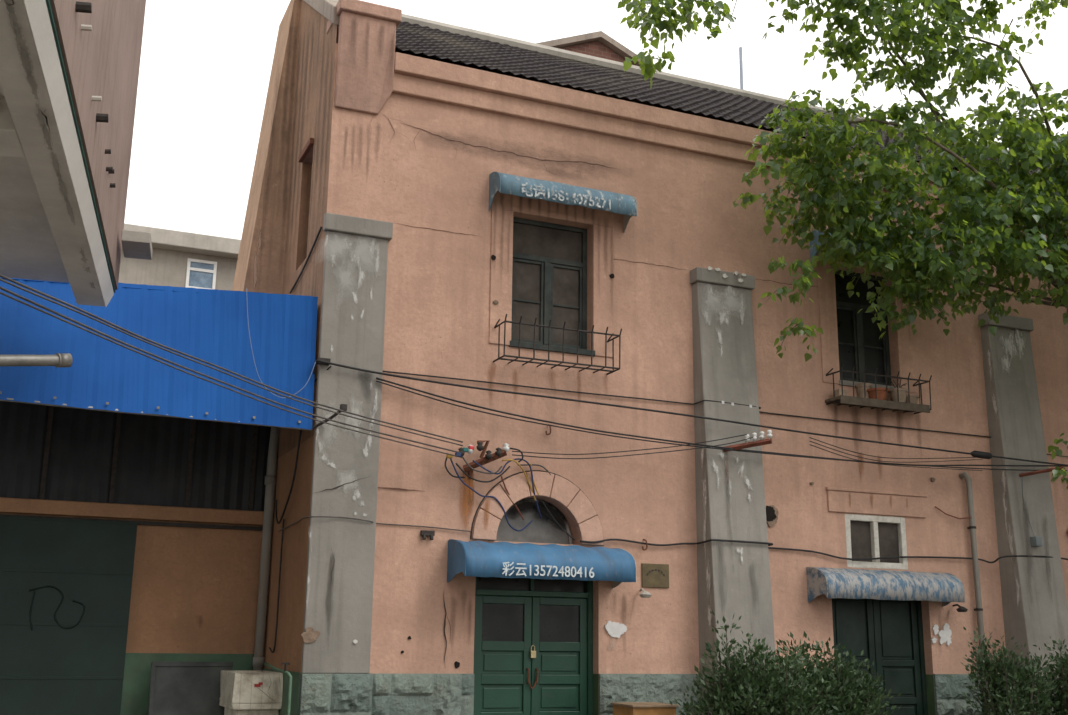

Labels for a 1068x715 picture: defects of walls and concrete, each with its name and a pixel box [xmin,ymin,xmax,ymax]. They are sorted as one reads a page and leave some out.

crack [370,113,620,176]
peeling [704,266,746,355]
rust [462,471,473,520]
crack [443,602,451,661]
peeling [931,623,952,646]